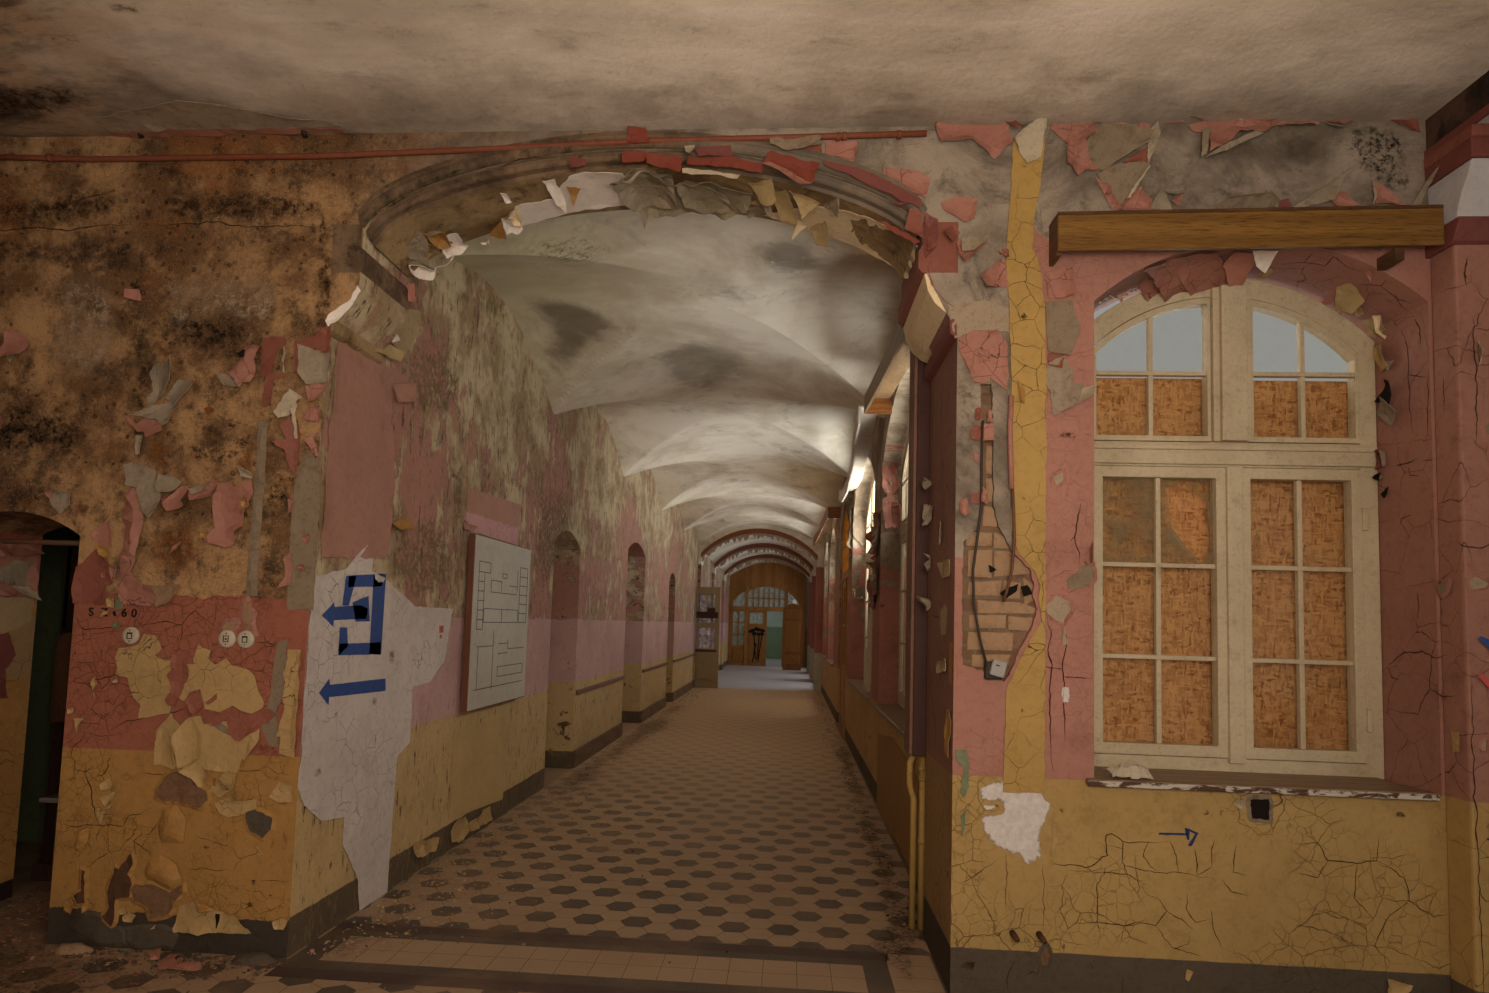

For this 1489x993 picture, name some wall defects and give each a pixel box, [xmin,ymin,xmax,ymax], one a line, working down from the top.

leakage [165,195,325,242]
peeling [935,114,1355,211]
peeling [1210,166,1439,209]
leakage [173,282,274,346]
leakage [0,410,72,450]
peeling [216,126,1097,690]
peeling [71,358,254,628]
peeling [0,544,45,698]
peeling [90,634,301,842]
peeling [64,850,251,947]
peeling [272,919,288,930]
crack [964,833,1245,990]